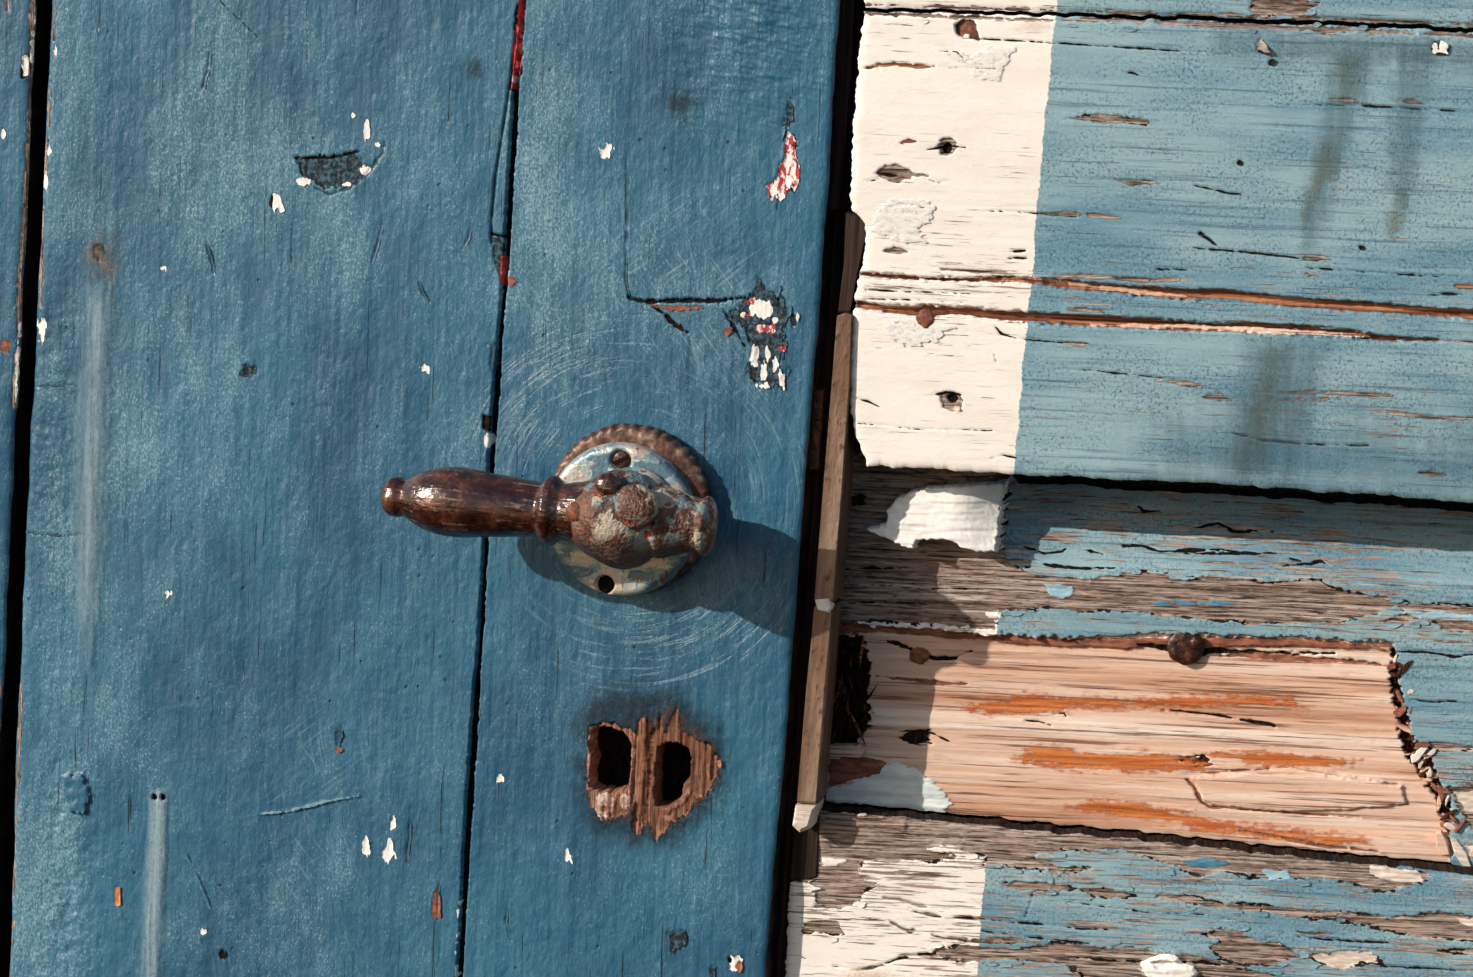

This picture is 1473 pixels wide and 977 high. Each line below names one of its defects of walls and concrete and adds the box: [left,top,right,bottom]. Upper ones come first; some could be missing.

peeling [294,112,385,195]
peeling [765,95,800,209]
crack [624,151,745,347]
peeling [725,275,799,390]
peeling [837,451,1473,636]
peeling [1428,741,1473,752]
peeling [796,757,1431,943]
peeling [1447,783,1473,851]
peeling [927,892,1473,977]